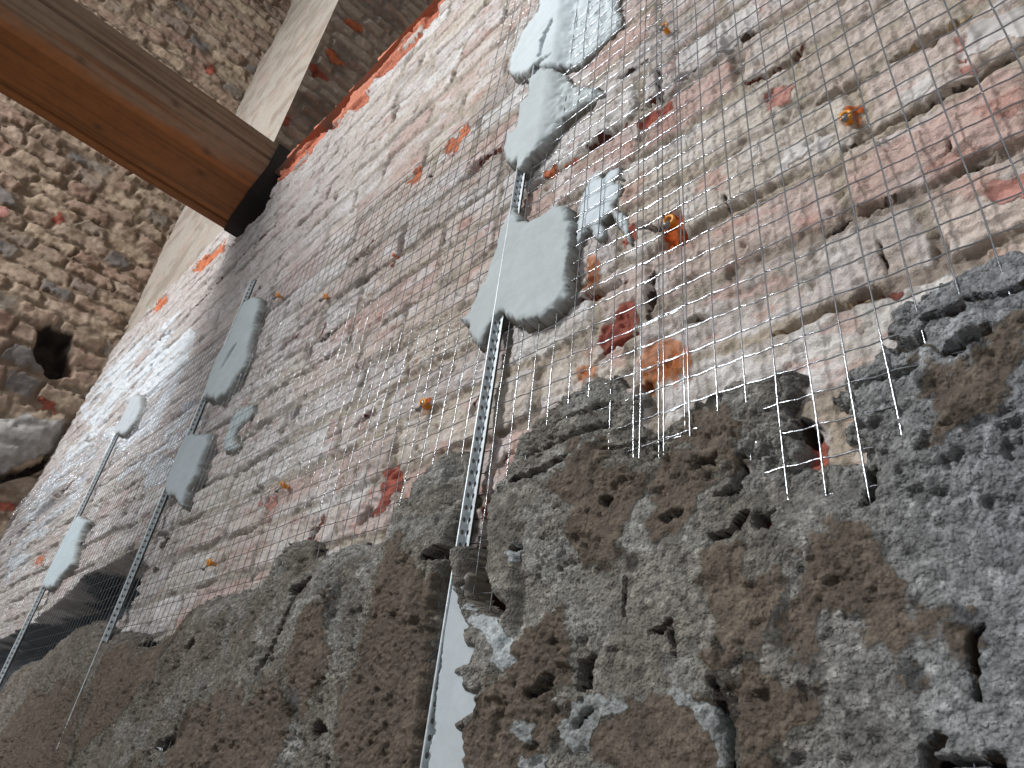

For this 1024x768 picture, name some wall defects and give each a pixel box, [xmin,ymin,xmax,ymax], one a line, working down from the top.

spalling [278,0,445,182]
spalling [33,325,73,380]
spalling [597,299,639,357]
spalling [371,463,403,517]